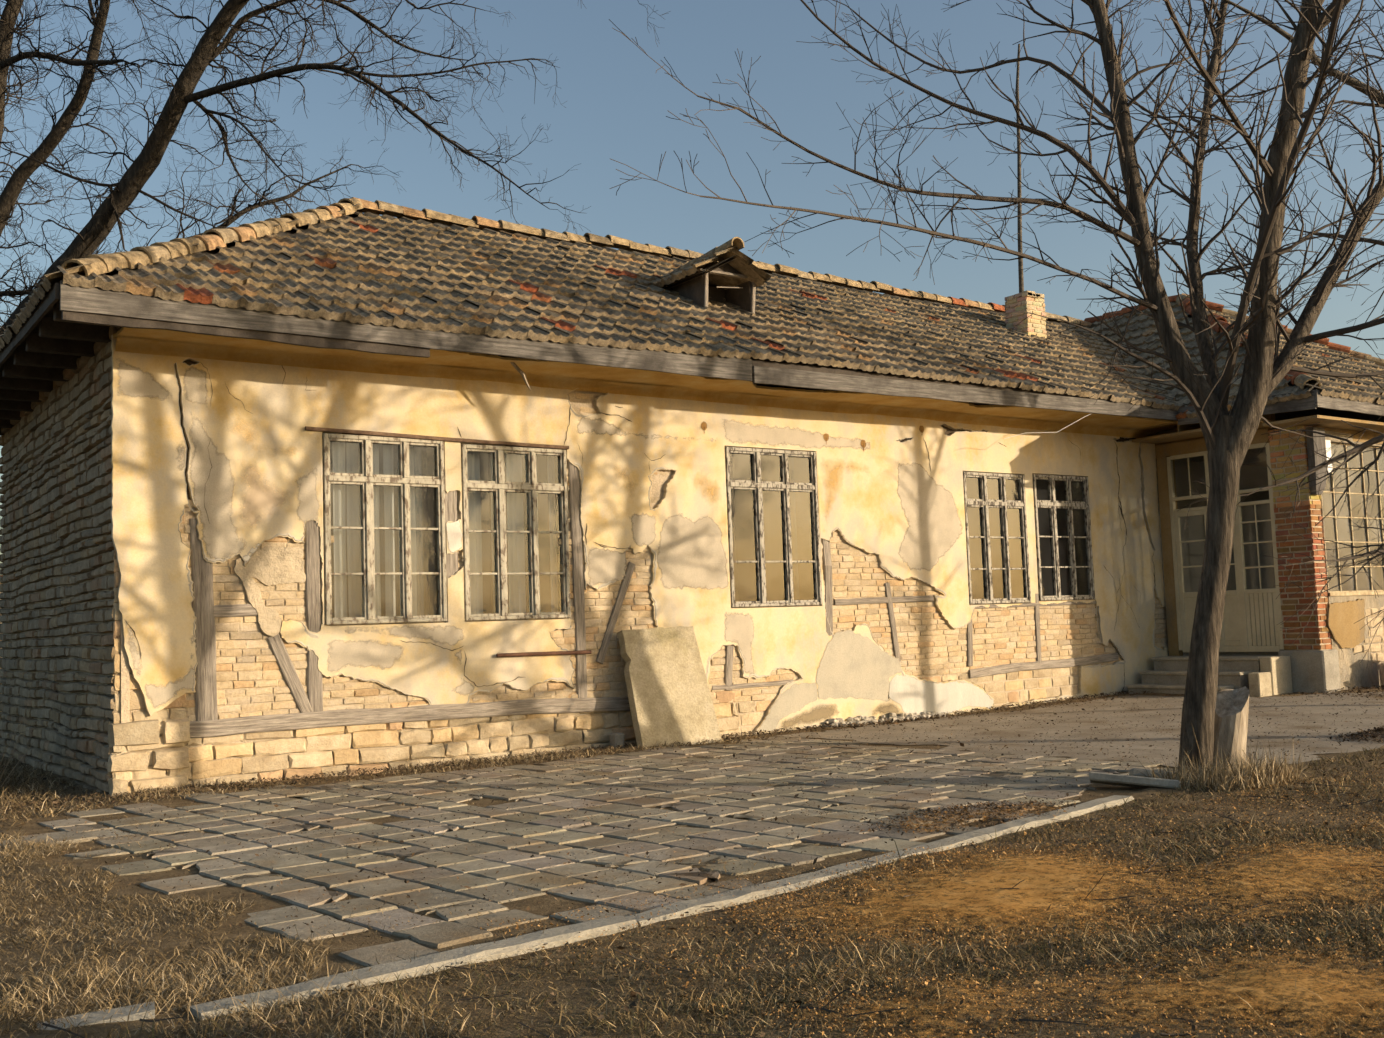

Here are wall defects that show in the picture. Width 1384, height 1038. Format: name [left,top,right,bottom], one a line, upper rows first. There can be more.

crack [174,362,251,523]
flaking render [118,358,463,721]
flaking render [455,460,728,714]
flaking render [822,463,1126,707]